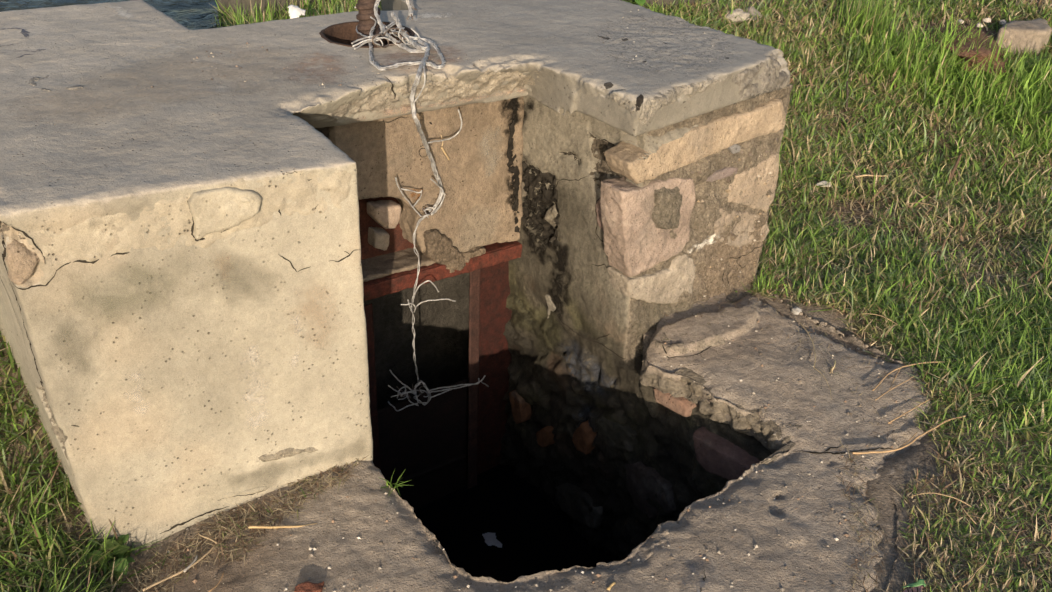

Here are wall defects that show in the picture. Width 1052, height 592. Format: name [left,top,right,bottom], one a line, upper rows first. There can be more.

spalling [327,66,539,120]
water stain [502,98,534,155]
spalling [0,170,352,290]
crack [278,250,355,272]
water stain [507,161,571,316]
crack [0,278,43,387]
crack [793,446,892,455]
crack [160,506,229,534]
spalling [612,525,672,572]